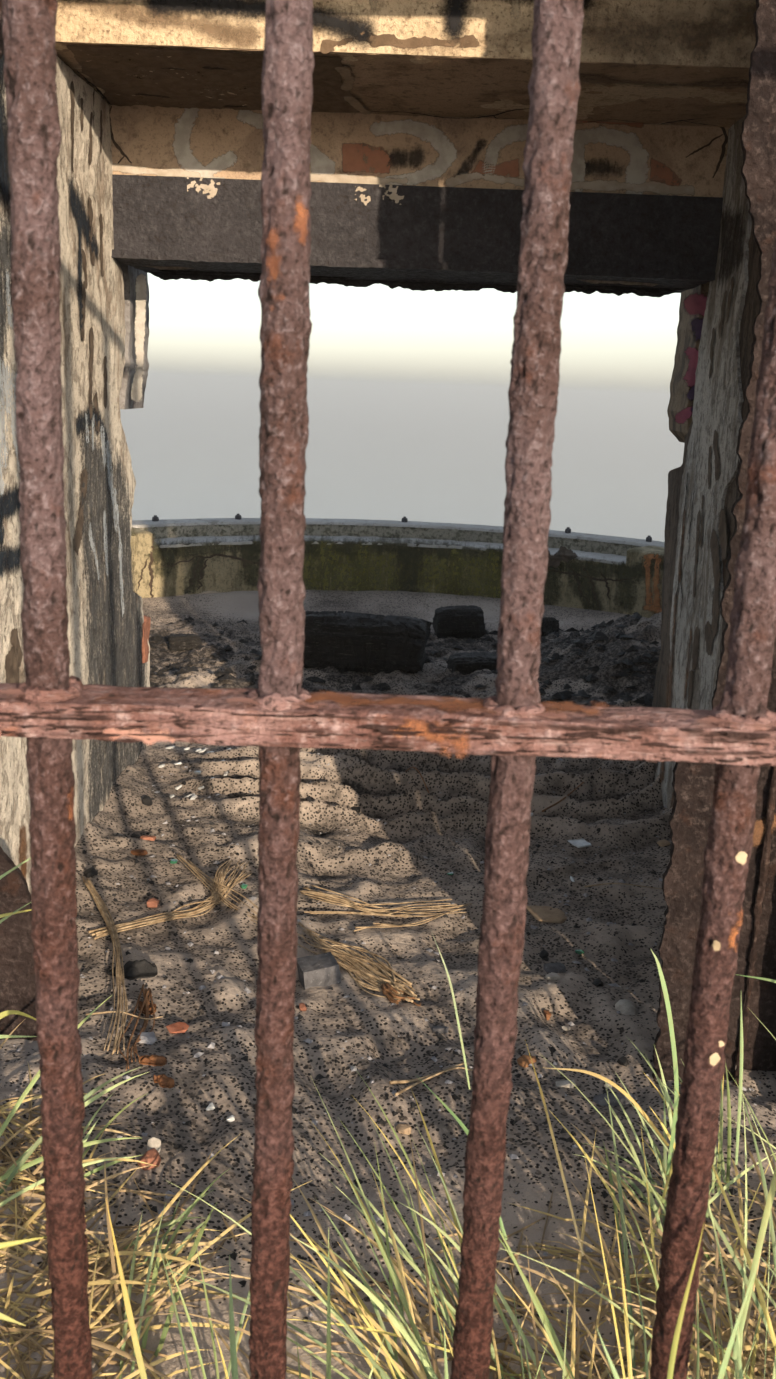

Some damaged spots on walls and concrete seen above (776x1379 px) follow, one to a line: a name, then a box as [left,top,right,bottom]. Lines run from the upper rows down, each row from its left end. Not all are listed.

spalling [311,32,479,114]
spalling [67,46,264,172]
corrosion [295,203,309,244]
corrosion [266,231,280,280]
damp [304,536,503,598]
damp [543,554,664,611]